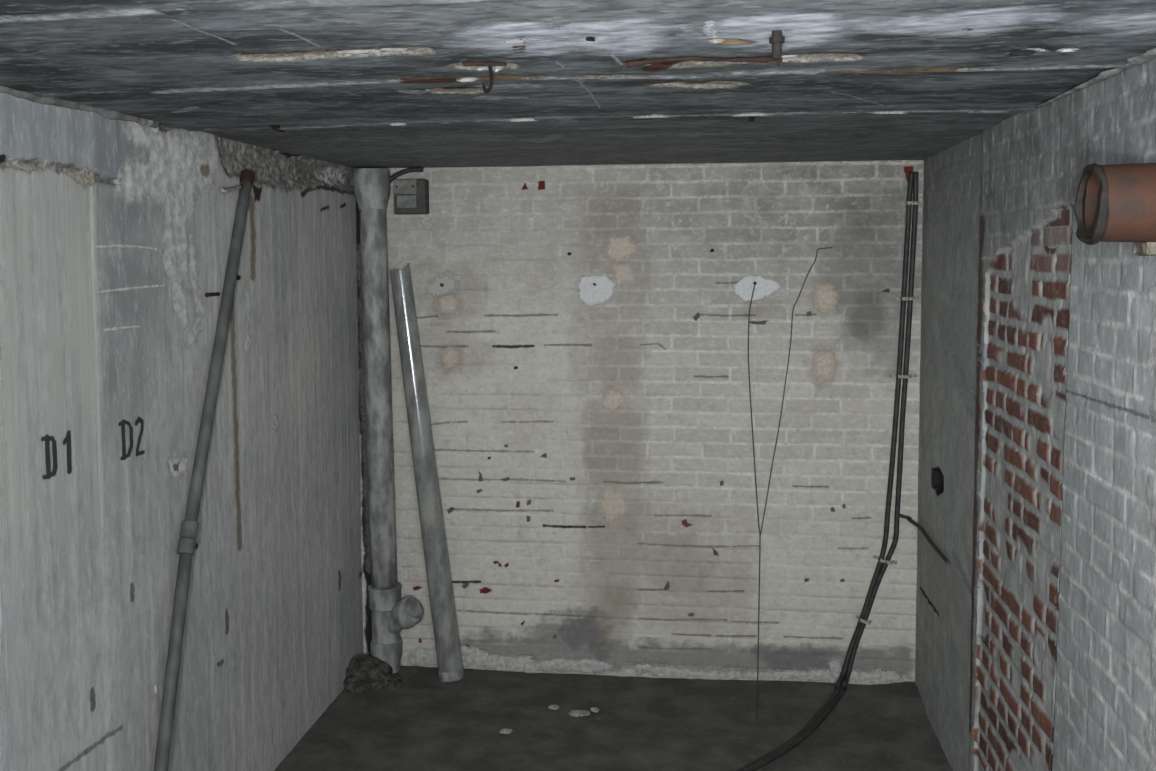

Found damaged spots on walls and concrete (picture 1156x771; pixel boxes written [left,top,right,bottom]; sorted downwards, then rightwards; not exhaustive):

water stain [452,7,1156,55]
spalling [231,45,437,62]
spalling [424,86,491,94]
rust [385,75,544,83]
spalling [449,61,522,71]
spalling [627,38,864,89]
peeling [113,121,354,348]
water stain [607,237,636,285]
flaking render [969,205,1072,771]
efflorescence [410,648,438,666]
efflorescence [460,645,613,674]
water stain [628,660,904,685]